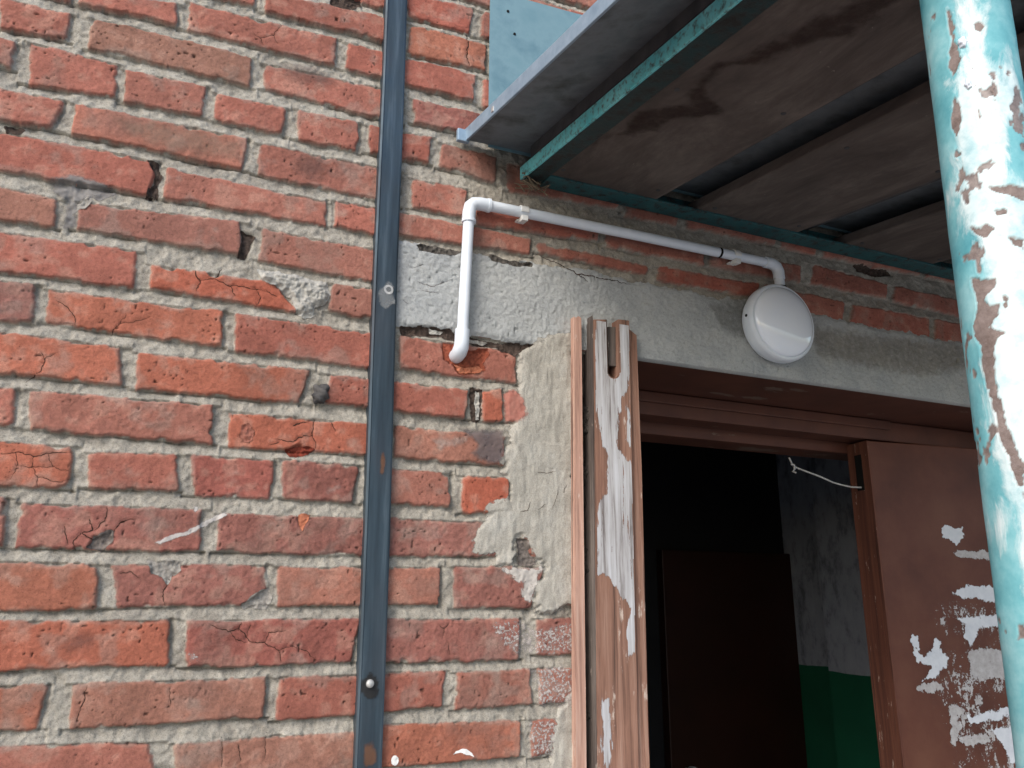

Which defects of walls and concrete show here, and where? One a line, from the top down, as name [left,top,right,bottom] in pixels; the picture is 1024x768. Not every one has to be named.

peeling [947,11,960,74]
peeling [951,99,961,136]
peeling [991,185,1024,200]
peeling [972,225,994,237]
crack [195,269,275,305]
crack [543,257,626,284]
peeling [973,253,1024,486]
crack [7,452,72,483]
flaking render [399,325,571,616]
crack [64,510,129,550]
crack [212,623,314,661]